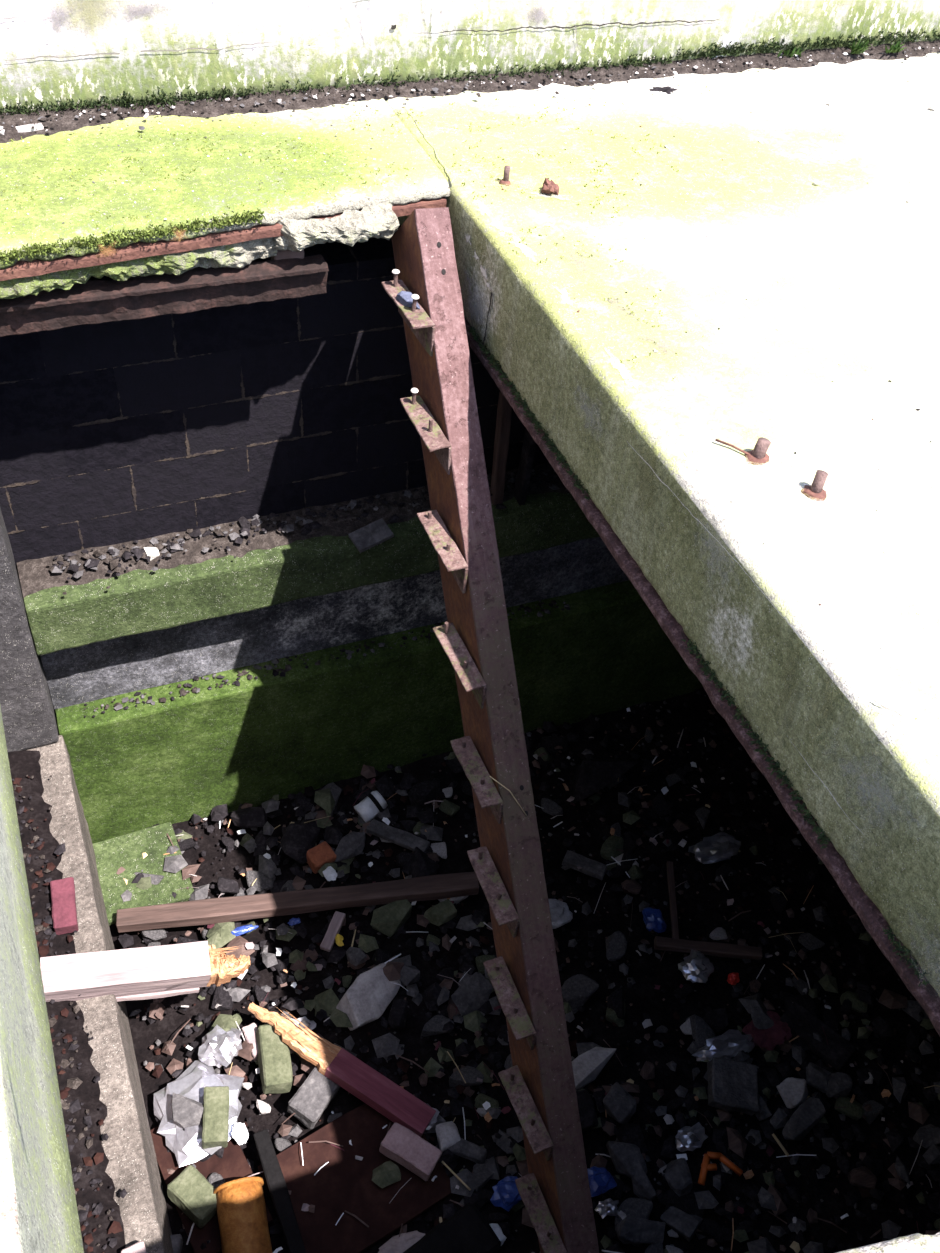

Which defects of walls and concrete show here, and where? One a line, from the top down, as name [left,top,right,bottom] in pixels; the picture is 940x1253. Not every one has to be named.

crack [418,19,718,52]
spalling [0,203,399,299]